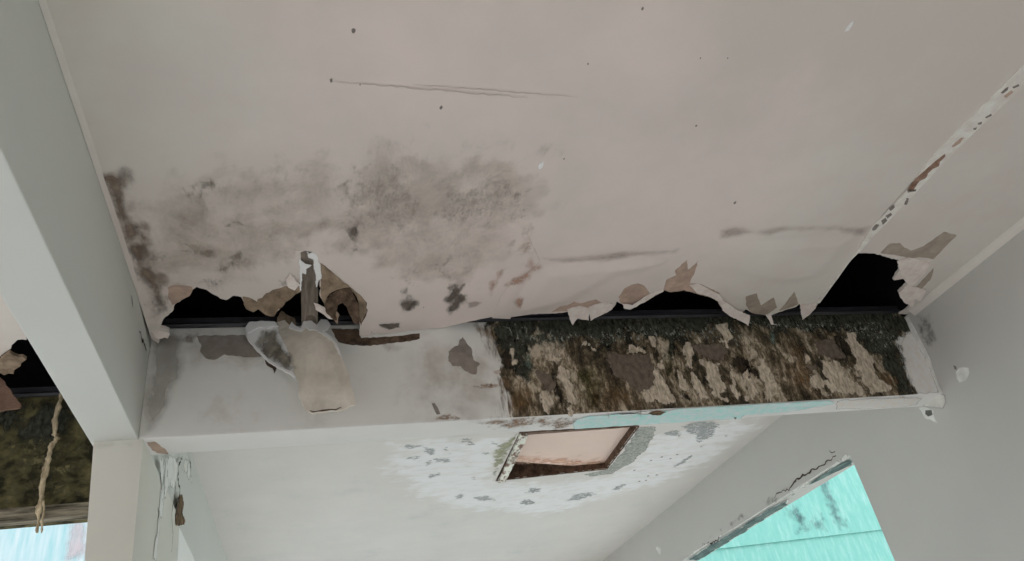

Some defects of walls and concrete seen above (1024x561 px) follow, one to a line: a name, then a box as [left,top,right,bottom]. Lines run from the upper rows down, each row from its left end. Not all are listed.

mould [103,175,165,304]
peeling [286,252,322,291]
peeling [881,232,957,307]
peeling [314,288,420,346]
mould [401,299,417,311]
mould [445,285,478,312]
peeling [567,288,664,325]
peeling [690,284,817,326]
peeling [186,335,276,373]
spalling [448,337,480,375]
water stain [476,313,938,417]
water stain [366,415,779,521]